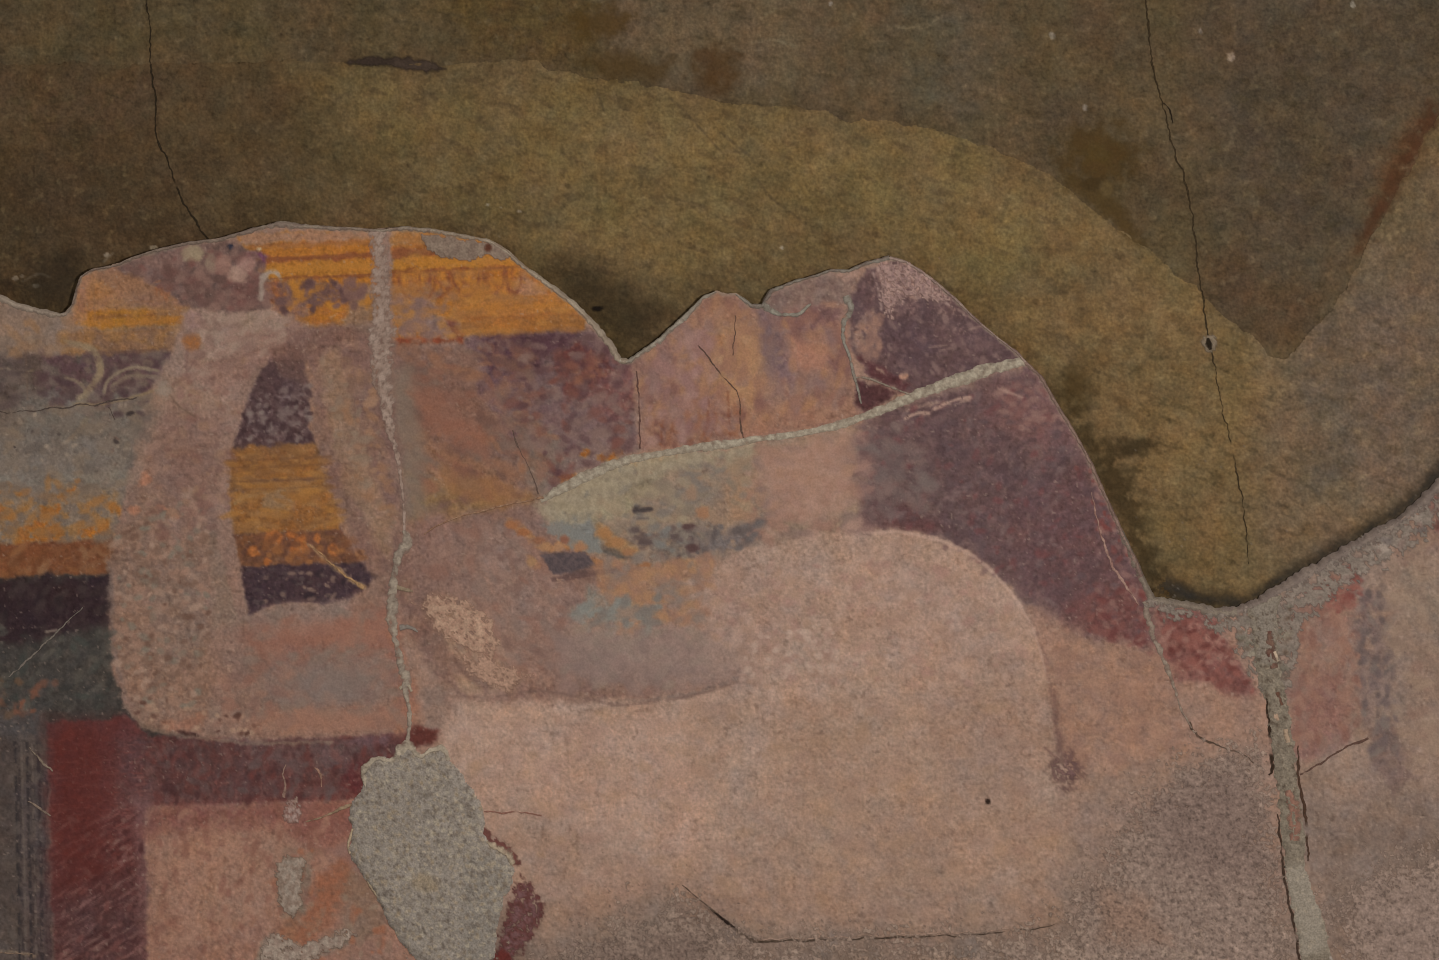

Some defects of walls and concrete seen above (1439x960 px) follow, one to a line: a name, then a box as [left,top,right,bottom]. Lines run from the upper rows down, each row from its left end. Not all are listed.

spalling [347,56,442,73]
crack [146,2,209,239]
spalling [421,234,513,261]
spalling [878,261,950,320]
crack [1145,0,1249,564]
crack [368,227,418,744]
crack [1300,737,1369,775]
spalling [275,854,306,918]
peeling [483,828,544,960]
crack [682,885,1054,943]
spalling [255,929,357,960]